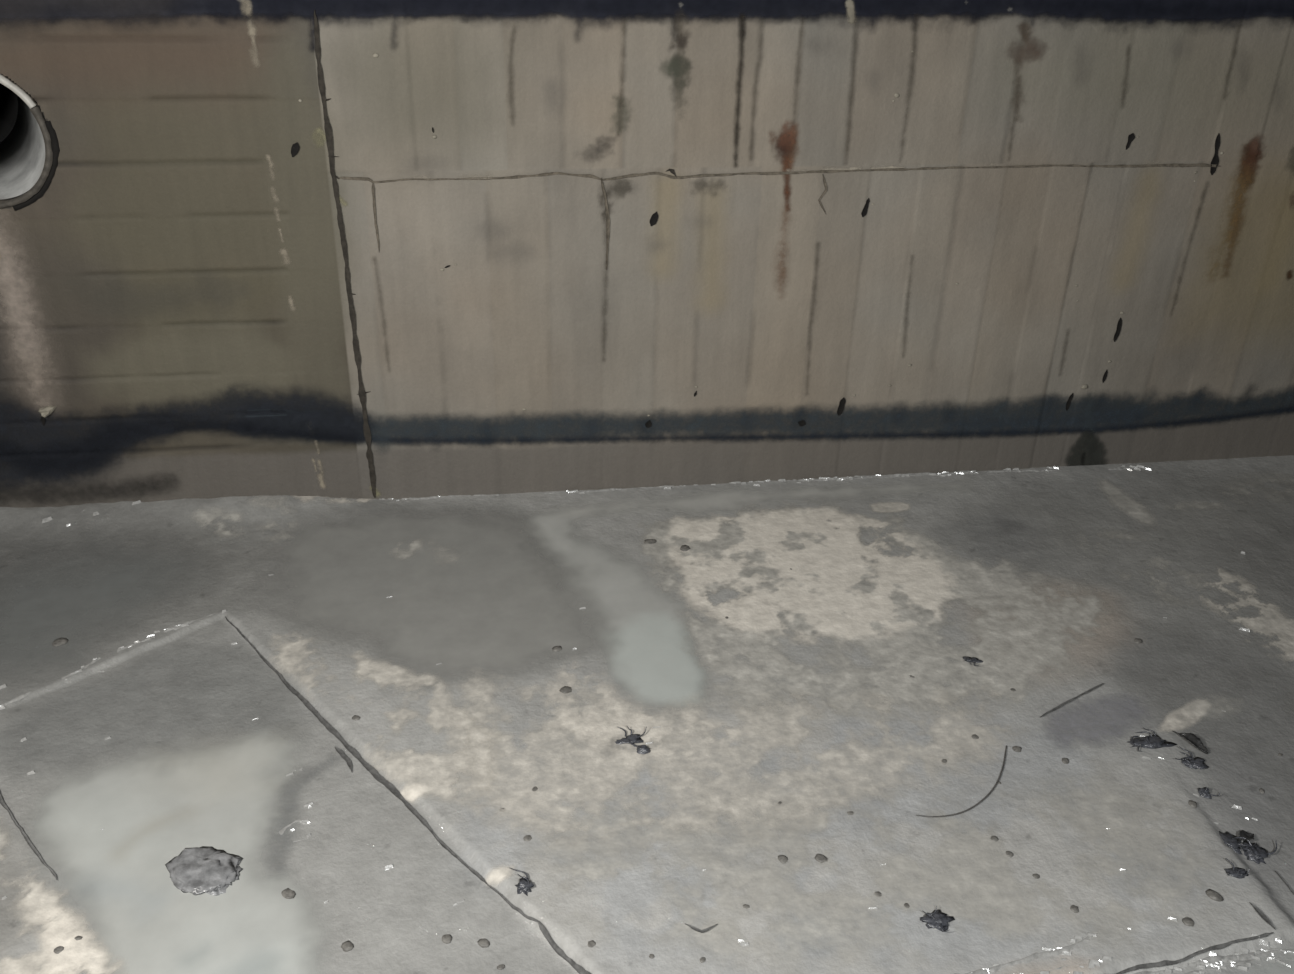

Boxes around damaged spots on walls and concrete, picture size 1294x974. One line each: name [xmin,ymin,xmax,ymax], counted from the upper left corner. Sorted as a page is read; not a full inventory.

rust [776,125,797,211]
rust [1228,137,1261,248]
crack [314,10,1221,498]
damp [0,227,1294,502]
damp [1101,481,1153,524]
damp [276,639,314,687]
damp [354,502,1101,951]
crack [0,794,57,880]
crack [225,617,591,974]
damp [0,882,118,974]
crack [685,923,718,933]
crack [1116,902,1276,974]